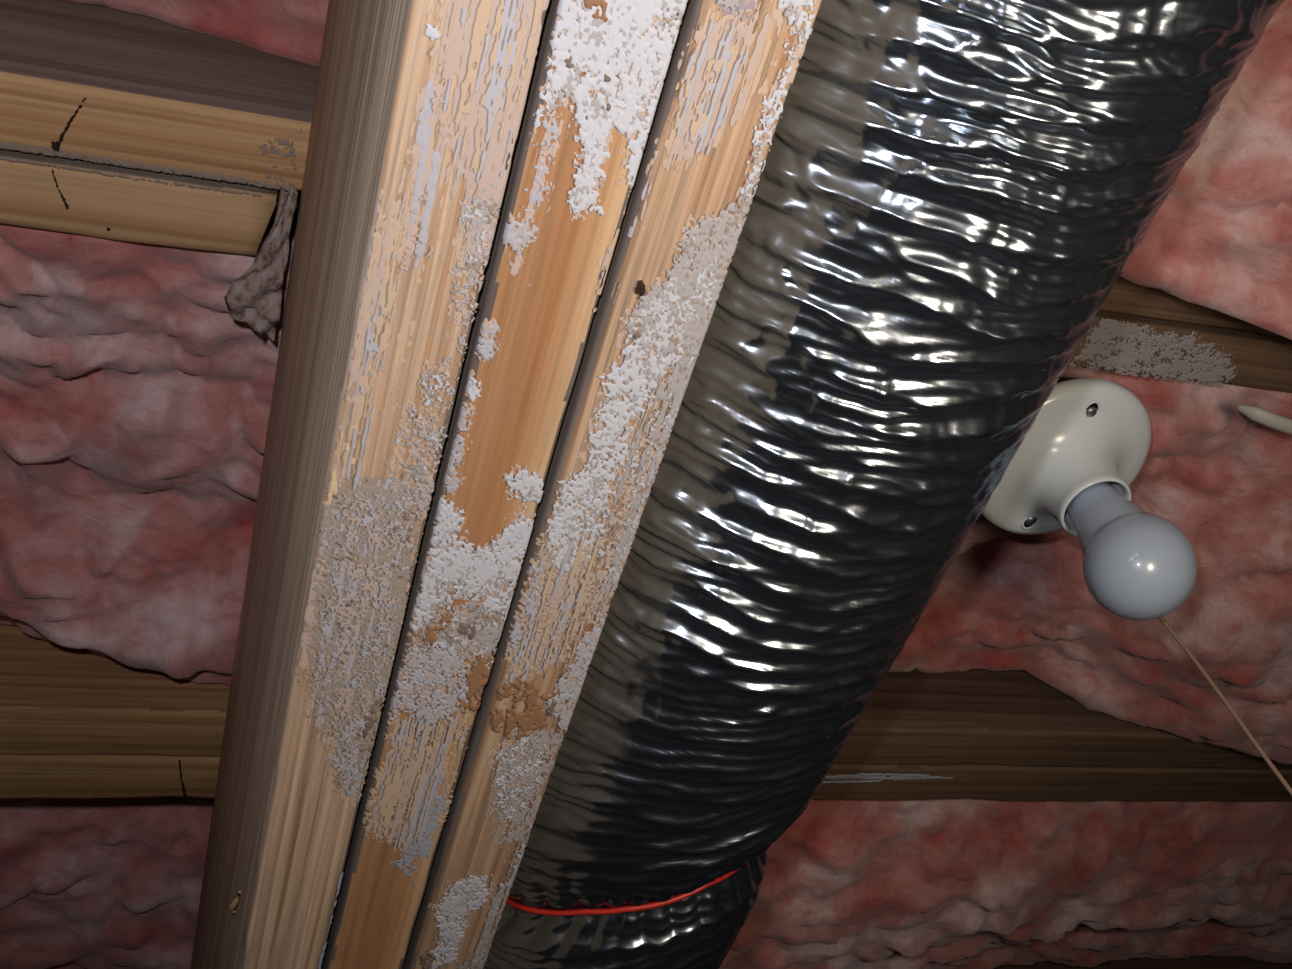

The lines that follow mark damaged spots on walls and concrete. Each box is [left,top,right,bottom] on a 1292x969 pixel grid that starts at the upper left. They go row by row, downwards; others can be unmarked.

leakage [258,129,303,185]
leakage [292,0,817,969]
leakage [822,773,954,784]